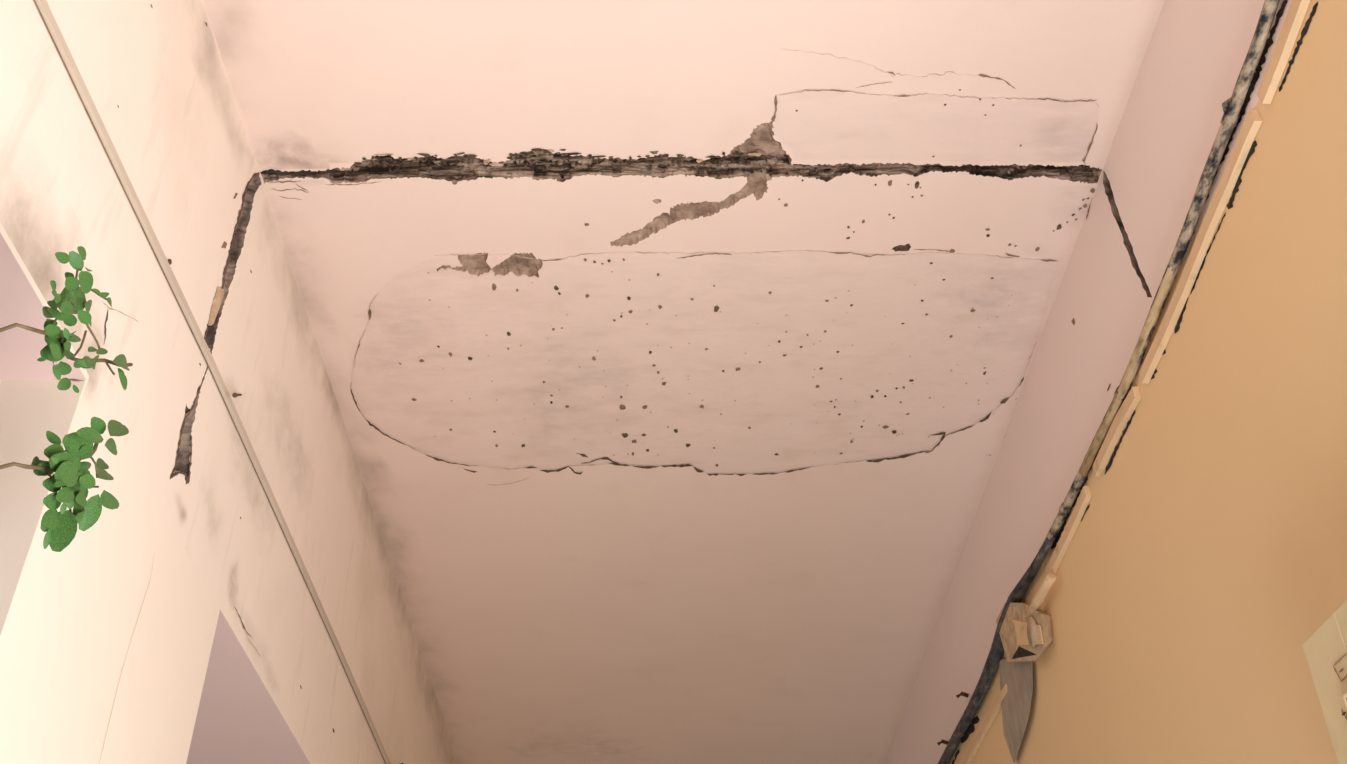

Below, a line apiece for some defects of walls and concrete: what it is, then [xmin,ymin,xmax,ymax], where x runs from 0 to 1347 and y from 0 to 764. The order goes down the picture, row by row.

flaking render [730,117,792,161]
flaking render [584,171,788,273]
flaking render [427,252,543,292]
crack [170,49,1152,485]
flaking render [610,385,658,456]